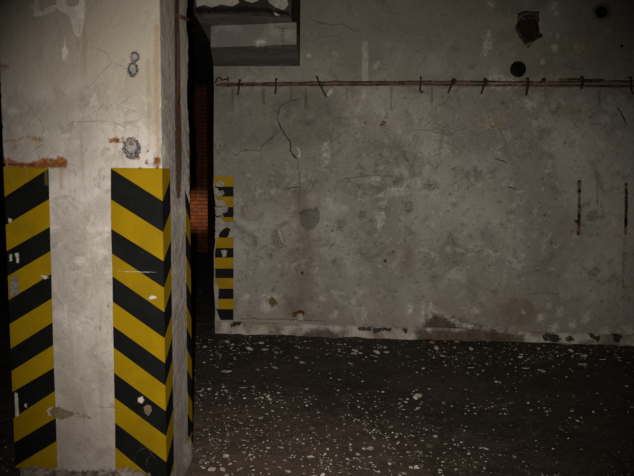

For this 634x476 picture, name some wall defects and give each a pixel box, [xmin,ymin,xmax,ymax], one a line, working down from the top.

peeling [29,0,86,49]
peeling [268,0,288,15]
spalling [515,11,542,48]
rust [175,0,190,198]
crack [277,99,300,159]
rust [4,156,67,168]
leakage [405,302,524,342]
peeling [542,333,574,342]
flaking render [47,407,92,419]